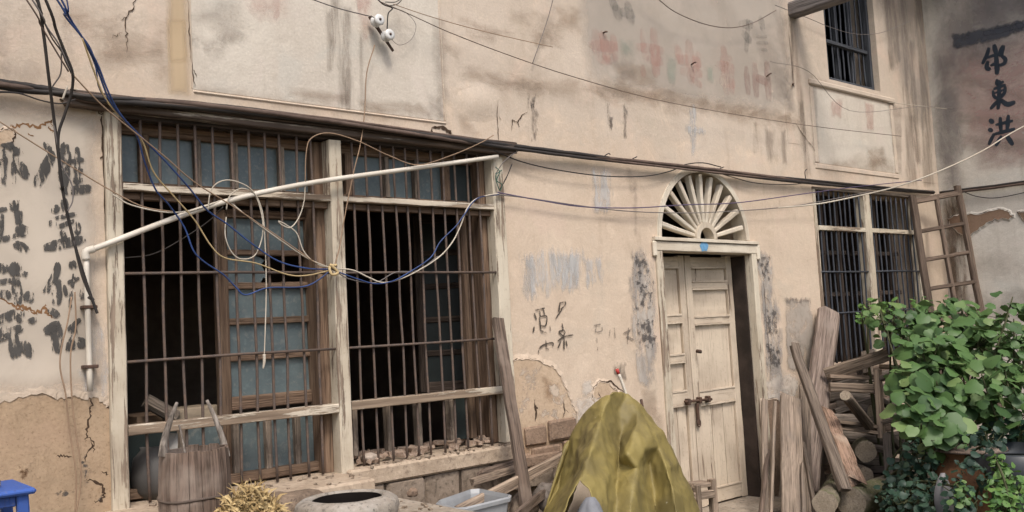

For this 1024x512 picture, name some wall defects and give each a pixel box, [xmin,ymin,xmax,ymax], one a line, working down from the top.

crack [112,0,136,50]
peeling [948,206,1024,238]
mould [630,254,657,385]
mould [758,254,783,379]
peeling [0,385,111,512]
crack [56,398,108,503]
peeling [513,353,622,456]